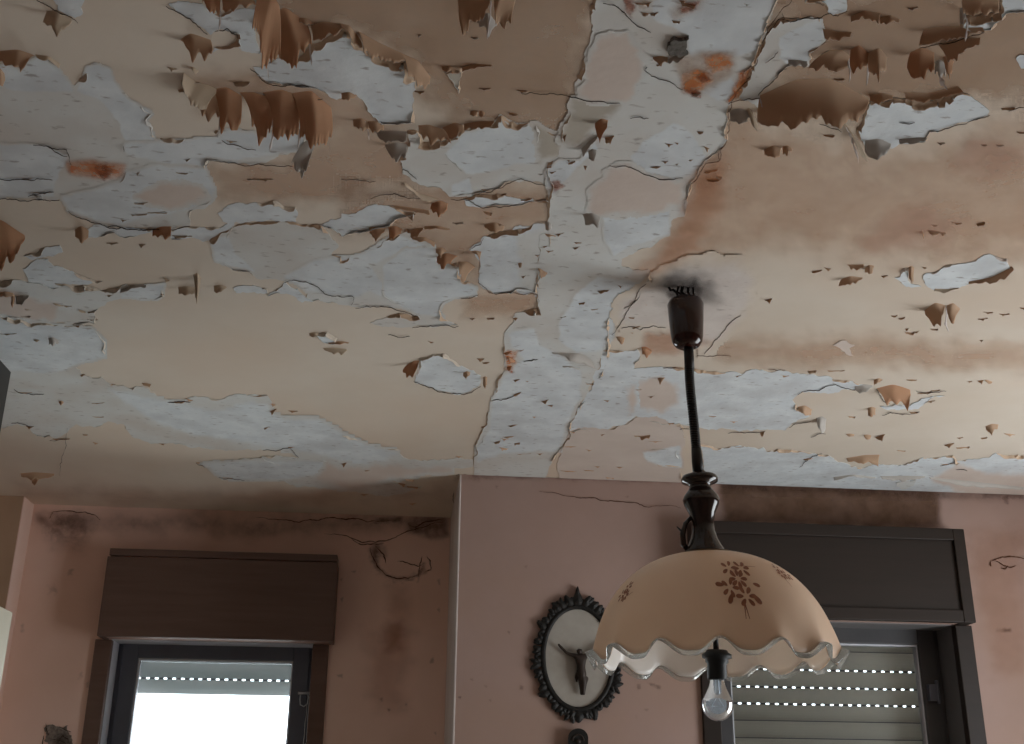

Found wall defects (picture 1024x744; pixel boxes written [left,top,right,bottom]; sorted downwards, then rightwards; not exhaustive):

corrosion [683,57,745,102]
corrosion [69,162,121,180]
peeling [0,0,1024,505]
crack [540,491,679,508]
crack [257,474,459,579]
crack [990,556,1024,569]